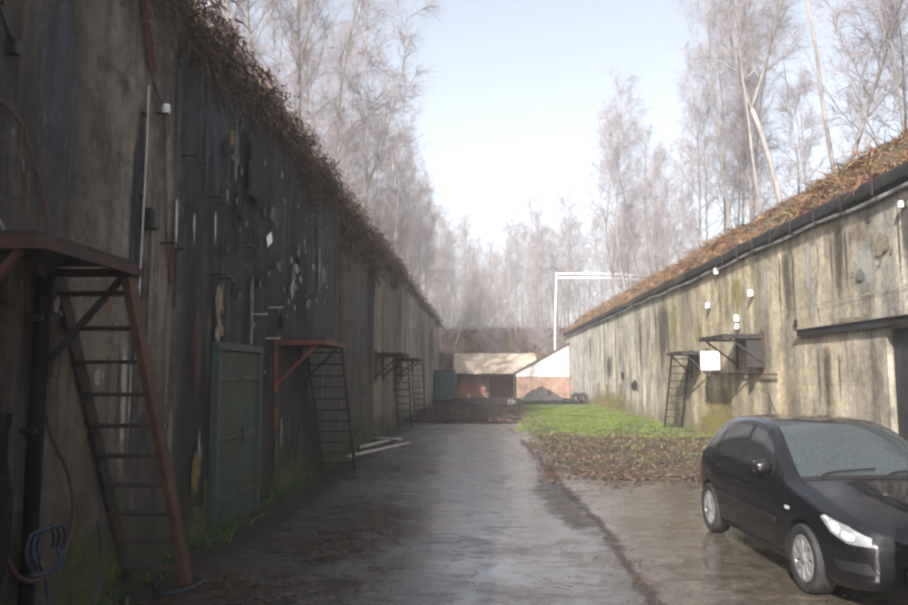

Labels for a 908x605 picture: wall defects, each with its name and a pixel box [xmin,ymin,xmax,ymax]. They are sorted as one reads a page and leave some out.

spalling [277,239,325,310]
damp [779,245,810,309]
damp [830,228,874,286]
damp [897,201,908,271]
peeling [215,285,224,342]